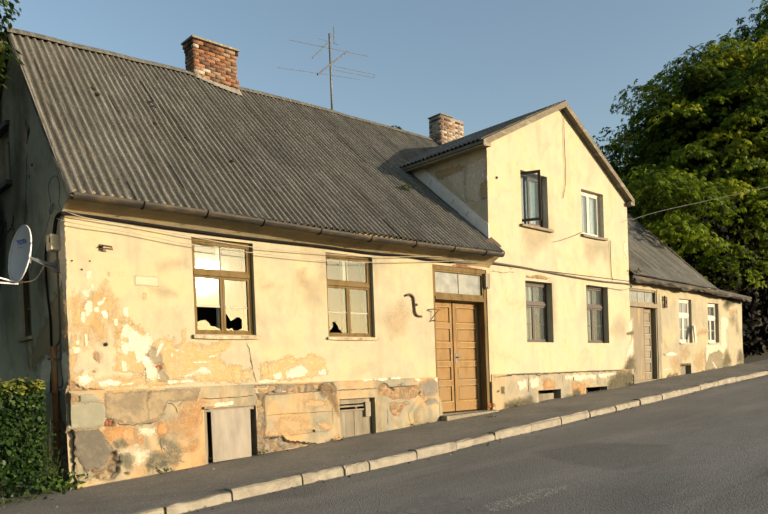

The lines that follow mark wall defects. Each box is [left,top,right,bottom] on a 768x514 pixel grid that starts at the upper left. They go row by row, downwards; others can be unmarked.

peeling [447,155,498,203]
flaking render [32,212,134,489]
peeling [81,260,215,436]
crack [115,345,257,462]
flaking render [254,363,335,454]
flaking render [364,377,421,417]
peeling [517,376,540,392]
peeling [565,372,616,381]
peeling [705,317,729,369]
flaking render [88,445,154,480]